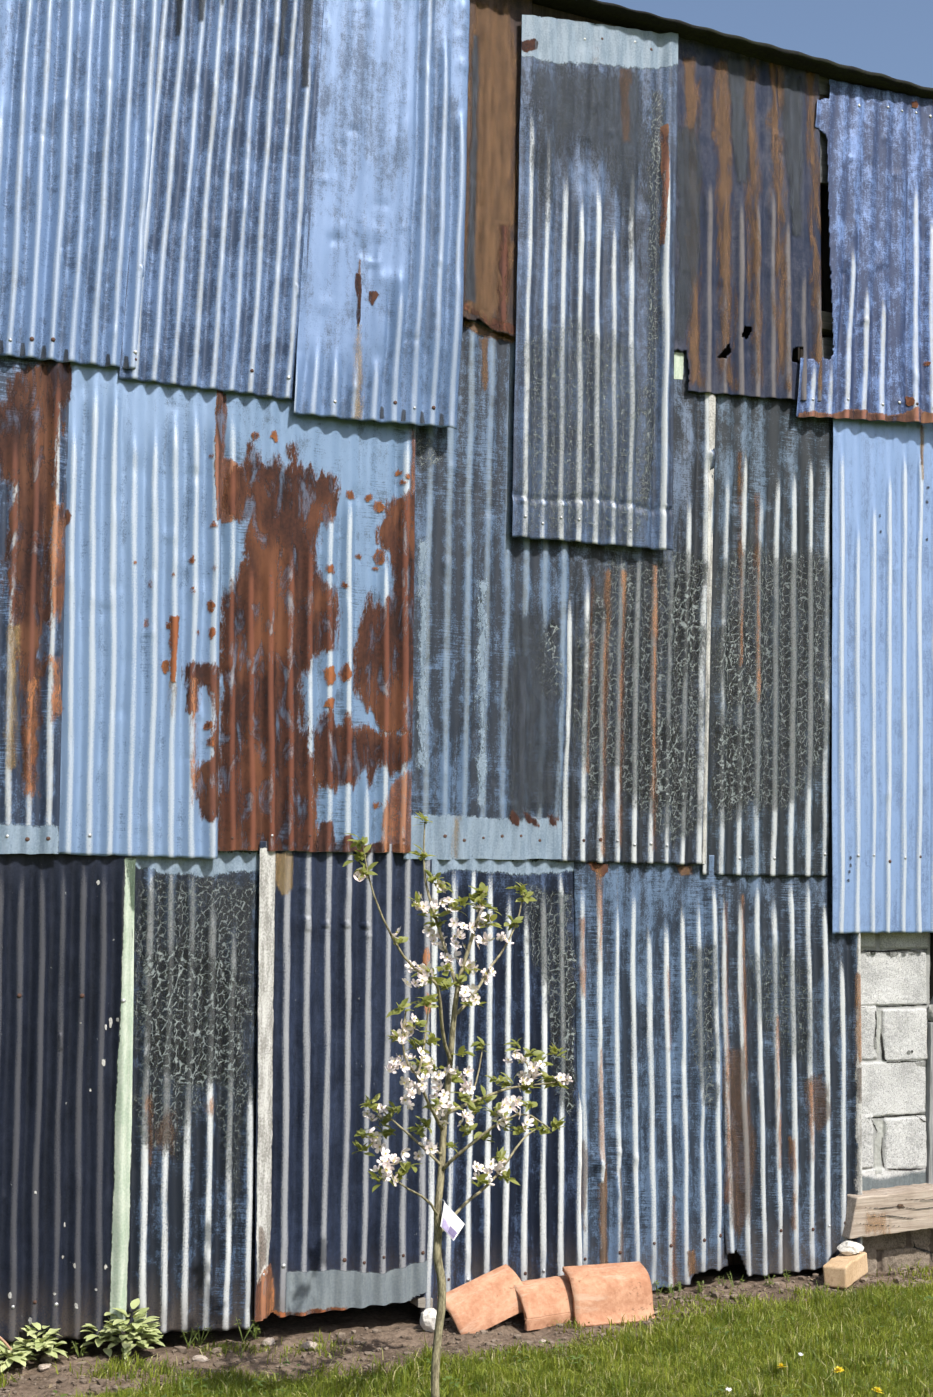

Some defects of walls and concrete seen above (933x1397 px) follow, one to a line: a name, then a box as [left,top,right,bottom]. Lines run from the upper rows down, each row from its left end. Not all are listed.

rust [463,0,538,391]
rust [660,57,822,390]
rust [0,361,72,796]
rust [161,390,416,853]
rust [798,396,933,464]